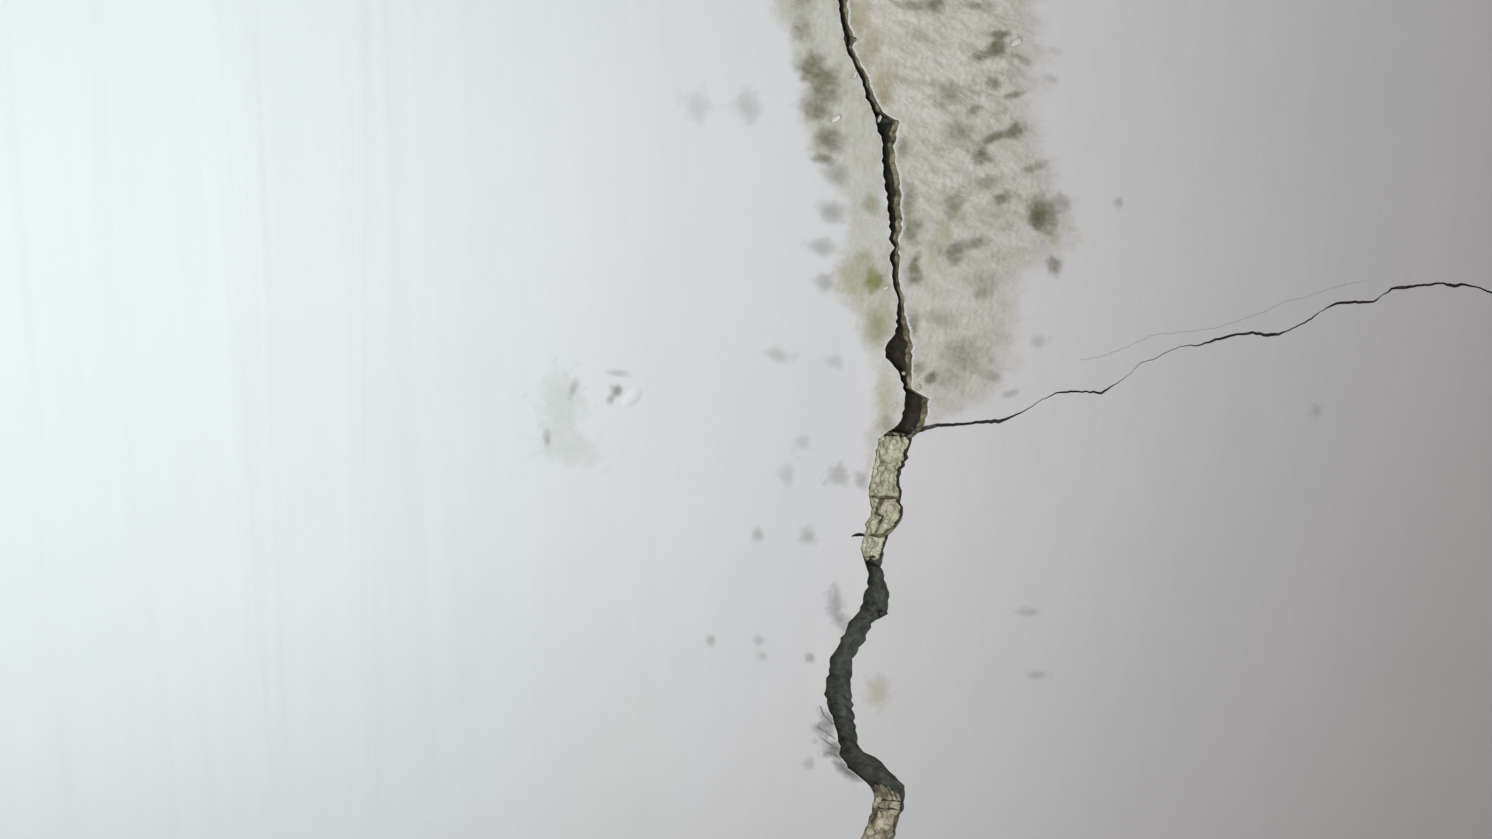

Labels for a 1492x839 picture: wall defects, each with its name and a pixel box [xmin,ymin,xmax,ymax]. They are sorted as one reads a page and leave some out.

water stain [778,0,1060,413]
water stain [874,400,904,434]
crack [824,0,1492,839]